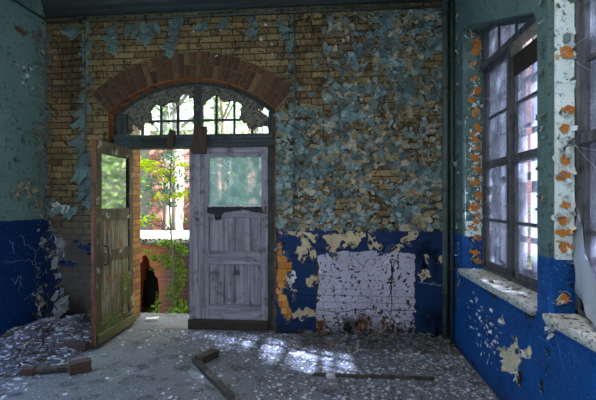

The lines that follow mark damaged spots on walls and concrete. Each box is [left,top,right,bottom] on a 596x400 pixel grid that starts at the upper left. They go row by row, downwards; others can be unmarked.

crack [6,235,43,269]
peeling [9,14,185,319]
peeling [273,8,443,324]
peeling [452,29,484,306]
spalling [468,291,532,388]
peeling [550,0,578,264]
peeling [553,282,575,307]